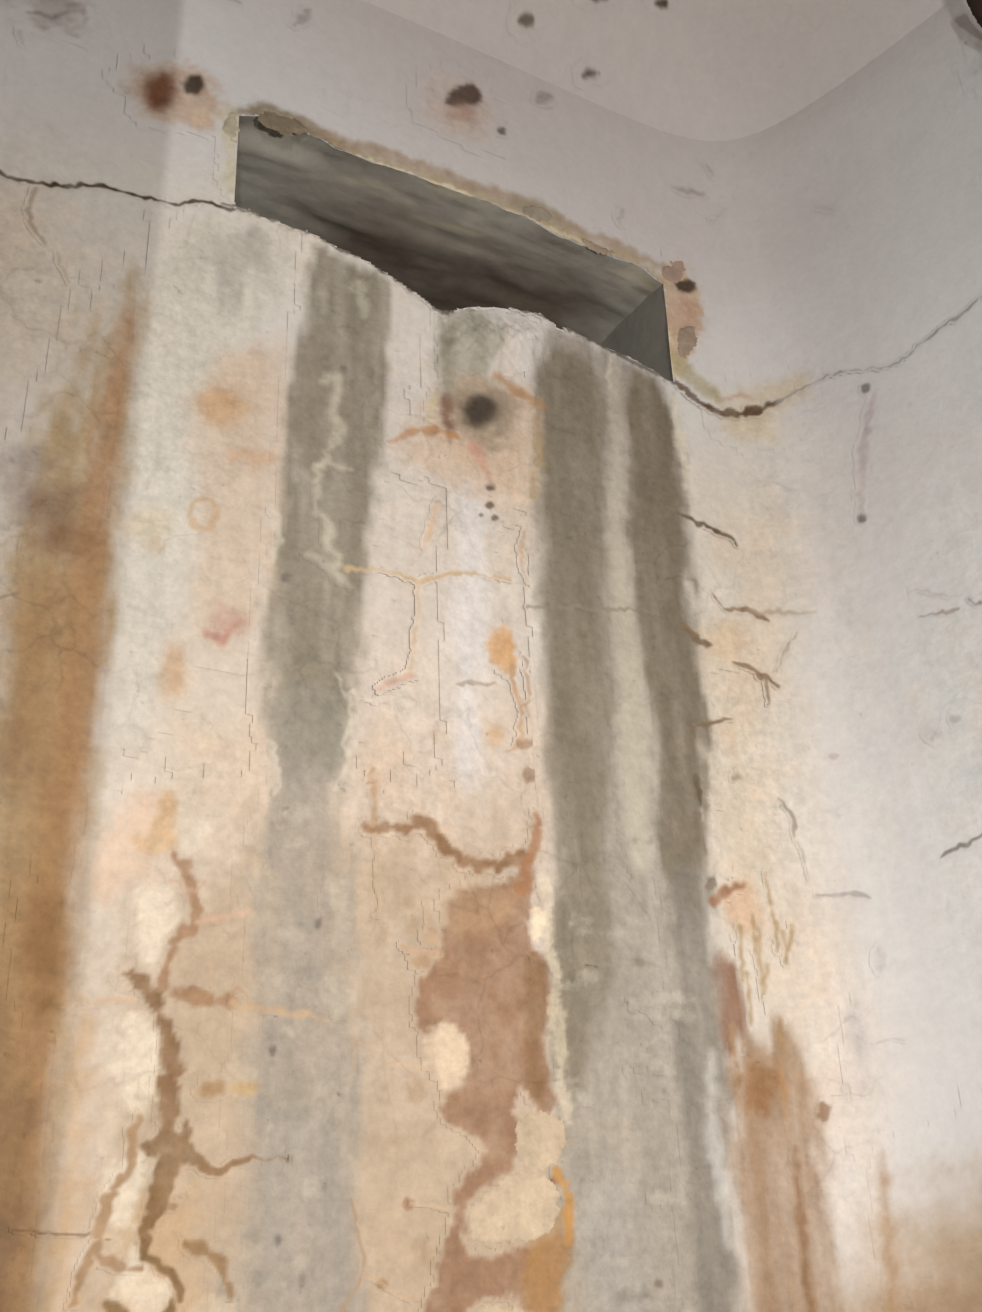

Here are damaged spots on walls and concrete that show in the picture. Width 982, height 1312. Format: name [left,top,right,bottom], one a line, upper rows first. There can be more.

corrosion [102,45,244,140]
spalling [643,0,678,20]
crack [0,168,456,317]
spalling [213,97,730,408]
flaking render [261,366,356,594]
crack [509,294,982,458]
flaking render [264,736,285,798]
water stain [0,197,757,1312]
flaking render [330,652,582,1312]
corrosion [704,866,911,1312]